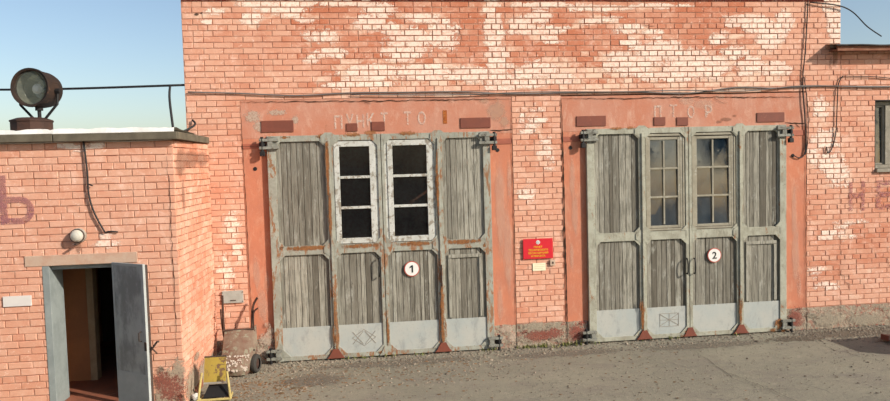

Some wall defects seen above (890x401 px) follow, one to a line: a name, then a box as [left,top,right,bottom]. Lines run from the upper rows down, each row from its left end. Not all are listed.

peeling [201,8,225,24]
peeling [235,0,796,90]
rust [317,134,332,236]
rust [448,239,485,247]
spalling [499,321,586,343]
peeling [153,351,219,401]